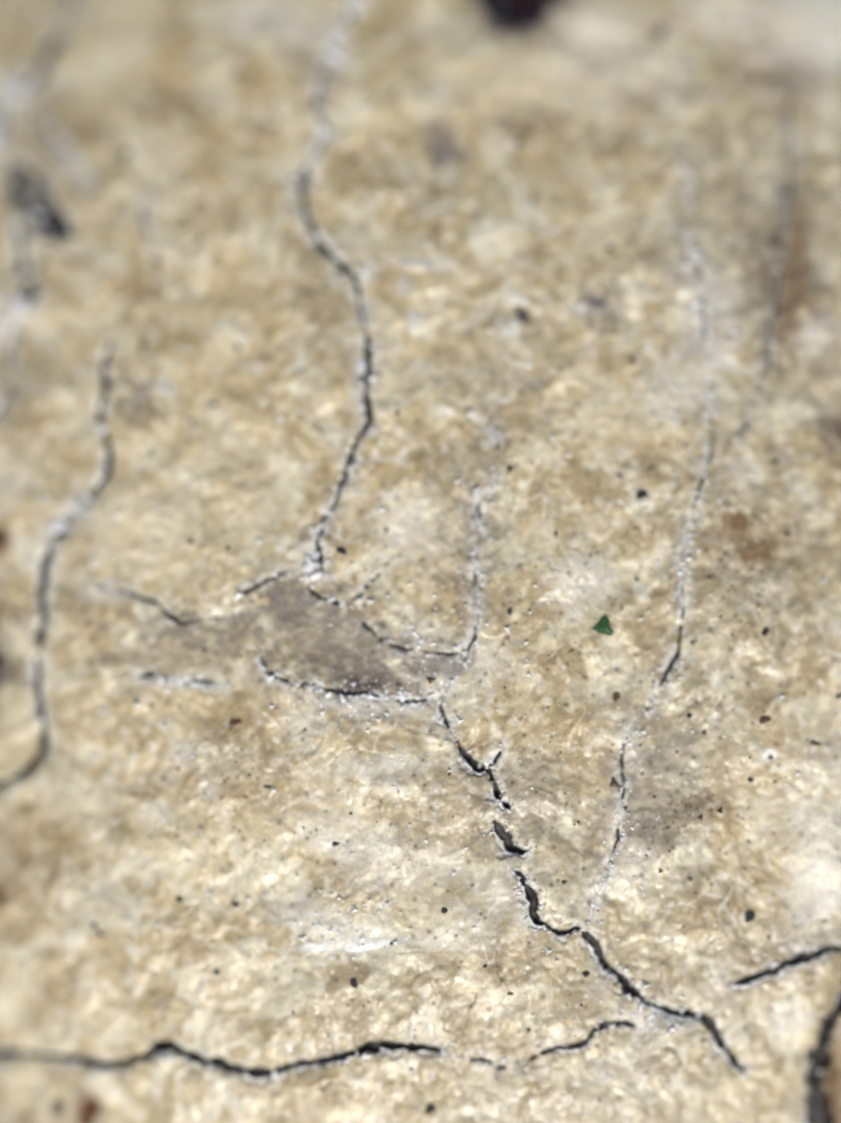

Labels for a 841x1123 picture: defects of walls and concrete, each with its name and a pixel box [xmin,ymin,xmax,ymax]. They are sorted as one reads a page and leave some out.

crack [321,331,373,522]
crack [35,431,114,650]
crack [661,625,682,685]
crack [323,688,369,703]
crack [450,735,511,813]
crack [493,820,532,857]
crack [511,869,581,937]
crack [730,945,841,989]
crack [0,1040,441,1082]
crack [540,1020,635,1054]
crack [580,930,746,1077]
crack [802,990,841,1123]